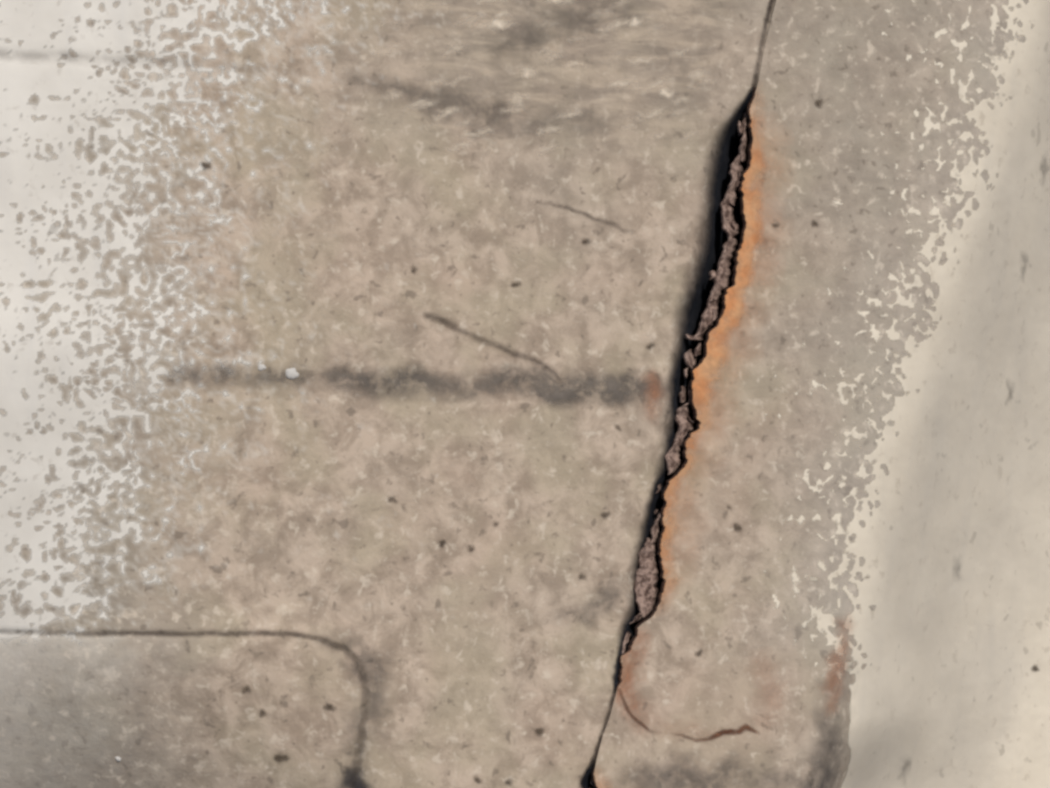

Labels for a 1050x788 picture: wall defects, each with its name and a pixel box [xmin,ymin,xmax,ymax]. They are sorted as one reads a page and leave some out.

crack [765,0,773,28]
corrosion [660,119,764,573]
damp [328,369,459,392]
damp [475,372,660,404]
crack [581,63,759,788]